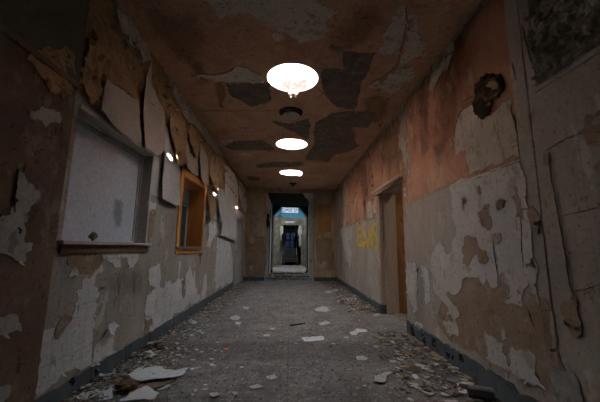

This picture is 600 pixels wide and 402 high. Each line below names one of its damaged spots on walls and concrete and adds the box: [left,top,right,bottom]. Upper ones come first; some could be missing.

peeling [205,0,339,45]
spalling [256,5,428,168]
peeling [0,170,41,266]
spalling [25,0,275,334]
peeling [405,73,582,394]
crack [546,134,600,292]
peeling [0,314,22,339]
peeling [36,252,140,395]